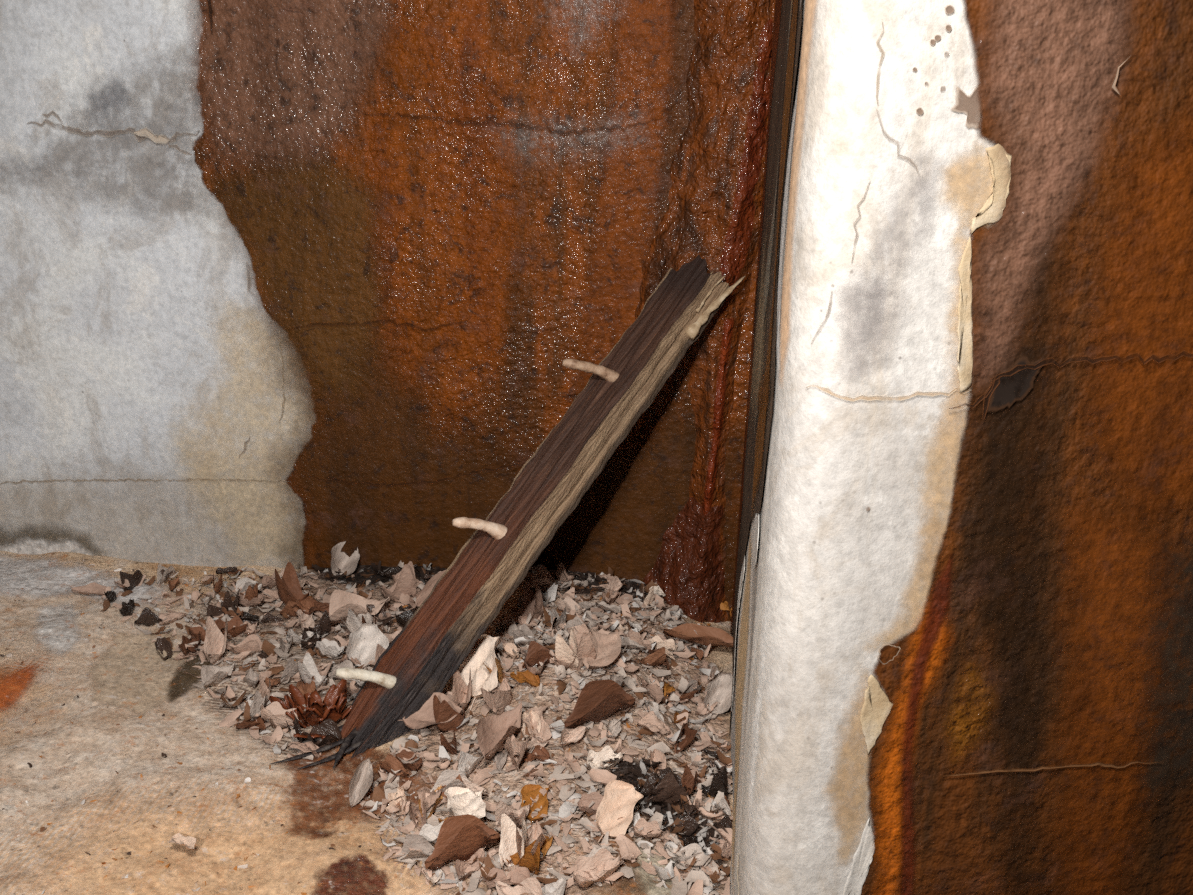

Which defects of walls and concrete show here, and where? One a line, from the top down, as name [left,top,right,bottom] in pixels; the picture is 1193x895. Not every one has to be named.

spalling [930,5,954,54]
crack [134,128,170,144]
spalling [925,81,981,129]
rust [193,0,697,582]
peeling [956,144,1012,393]
crack [806,351,1193,420]
rust [861,0,1193,895]
rust [723,252,758,871]
peeling [731,513,759,712]
rust [0,663,38,708]
peeling [860,675,893,755]
peeling [843,818,876,895]